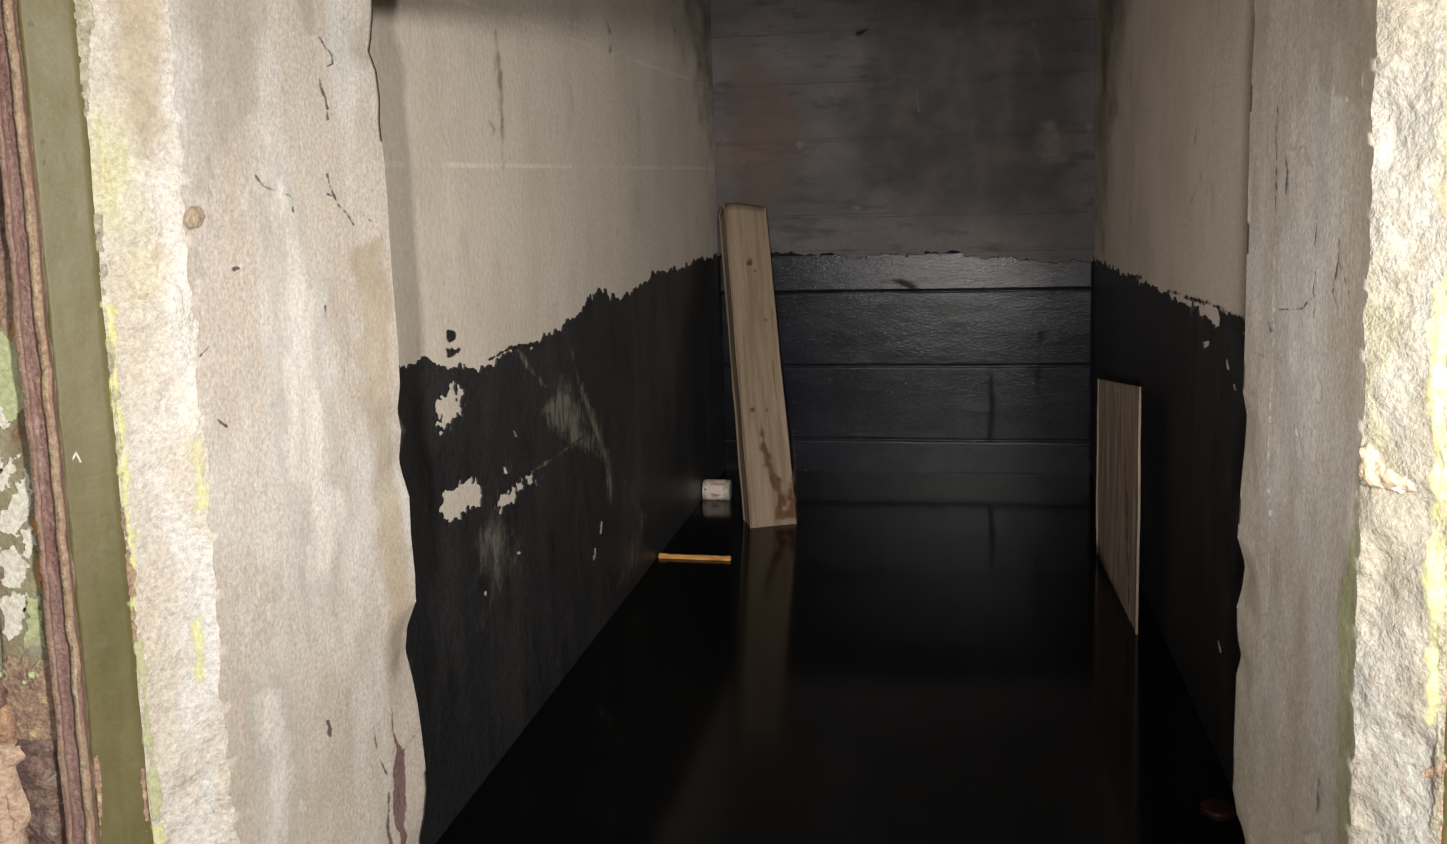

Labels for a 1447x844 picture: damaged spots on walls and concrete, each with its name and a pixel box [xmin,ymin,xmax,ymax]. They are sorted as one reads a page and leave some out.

corrosion [0,248,15,341]
peeling [489,342,539,361]
peeling [0,406,10,430]
peeling [0,451,46,650]